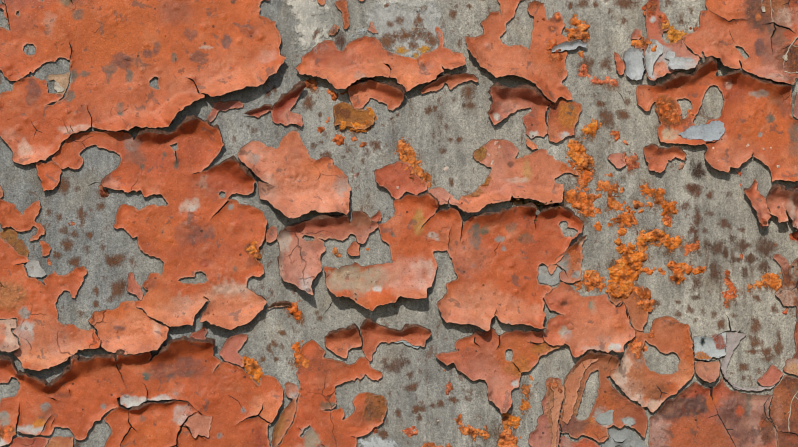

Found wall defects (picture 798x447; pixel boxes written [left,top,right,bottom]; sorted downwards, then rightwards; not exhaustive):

rust [304,79,399,163]
peeling [287,0,587,143]
rust [564,0,619,88]
peeling [614,0,798,189]
crack [768,22,798,56]
peeling [0,0,398,447]
rust [563,98,782,329]
peeling [237,130,798,447]
crack [117,384,202,447]
crack [228,395,270,423]
rust [454,375,533,447]
crack [763,394,798,436]